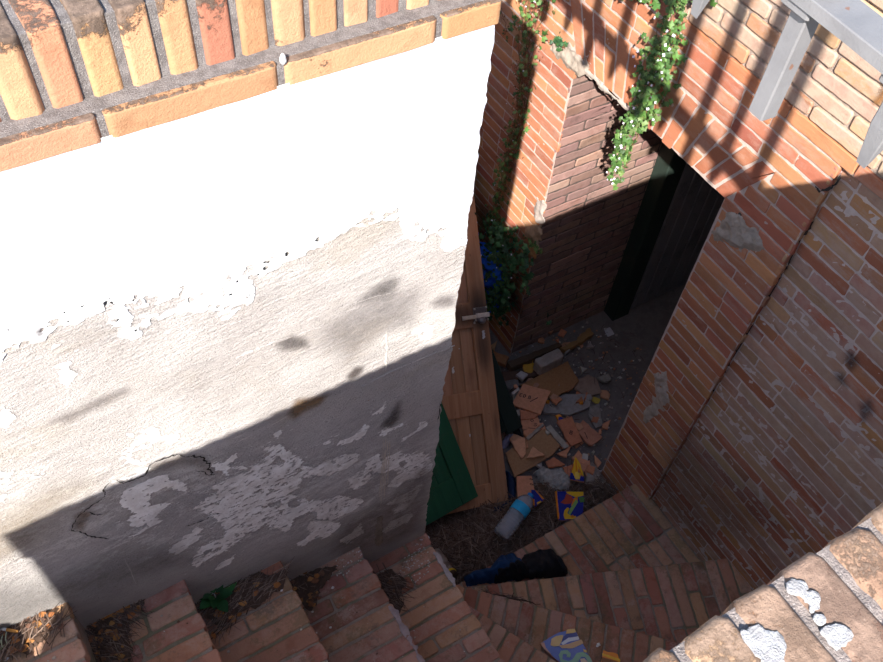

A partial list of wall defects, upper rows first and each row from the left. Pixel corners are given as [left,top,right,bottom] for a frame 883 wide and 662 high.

spalling [711,212,765,252]
crack [712,221,814,393]
crack [71,454,217,539]
peeling [0,209,466,631]